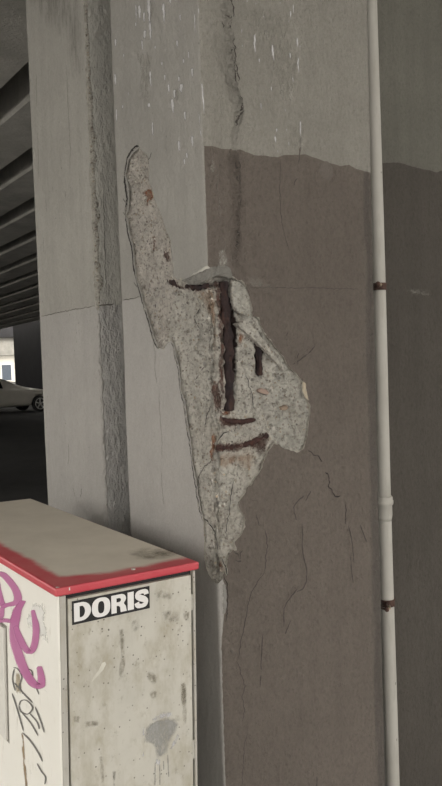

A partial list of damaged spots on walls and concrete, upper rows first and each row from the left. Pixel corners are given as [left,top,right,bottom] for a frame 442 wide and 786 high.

crack [43,143,203,520]
corrosion [170,280,248,426]
spalling [124,148,311,622]
corrosion [210,433,268,461]
crack [308,450,347,524]